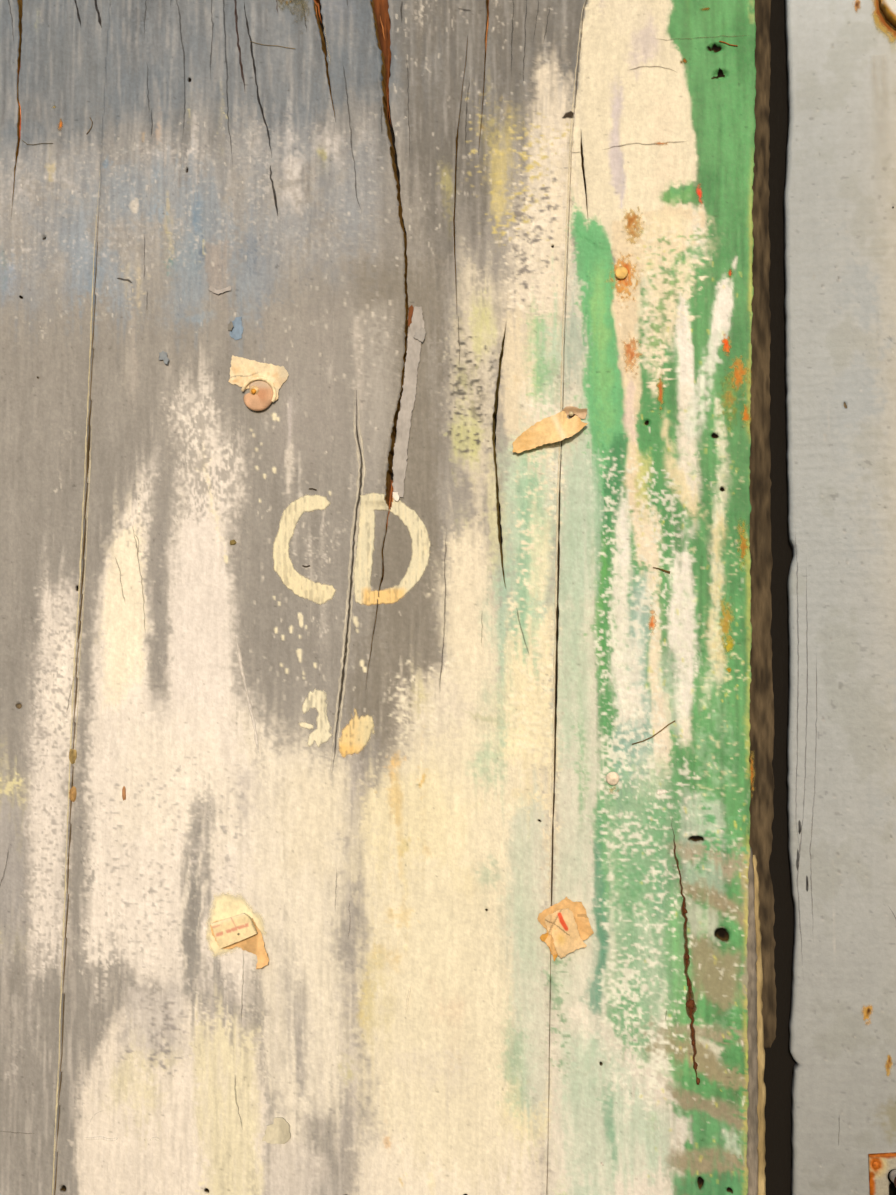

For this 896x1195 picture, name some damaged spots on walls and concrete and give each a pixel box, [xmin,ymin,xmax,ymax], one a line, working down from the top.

crack [10,0,22,204]
crack [224,0,278,215]
crack [276,0,345,115]
corrosion [855,0,896,41]
corrosion [611,210,643,298]
crack [330,0,410,771]
crack [492,327,506,587]
crack [671,823,700,1085]